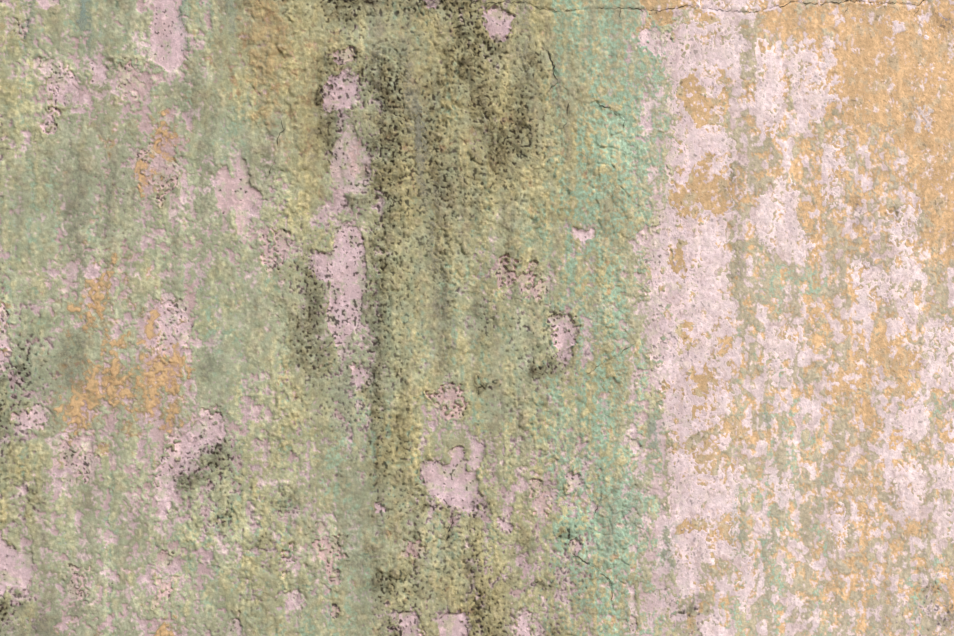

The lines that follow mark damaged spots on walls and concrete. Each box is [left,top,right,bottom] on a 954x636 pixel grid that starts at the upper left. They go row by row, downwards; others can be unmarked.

peeling [148,0,188,72]
water stain [441,2,502,57]
peeling [482,5,516,43]
peeling [32,57,146,135]
peeling [320,46,359,113]
water stain [359,58,401,153]
peeling [330,123,372,192]
peeling [215,157,262,239]
peeling [308,222,368,347]
peeling [547,313,581,363]
peeling [635,0,954,622]
peeling [419,440,484,515]